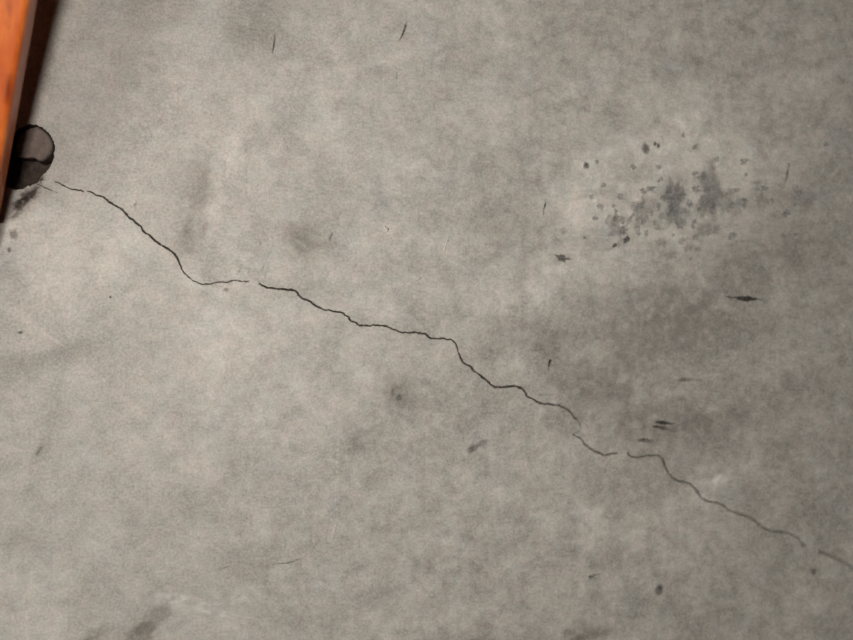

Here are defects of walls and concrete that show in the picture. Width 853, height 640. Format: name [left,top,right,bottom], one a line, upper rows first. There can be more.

crack [37,182,571,412]